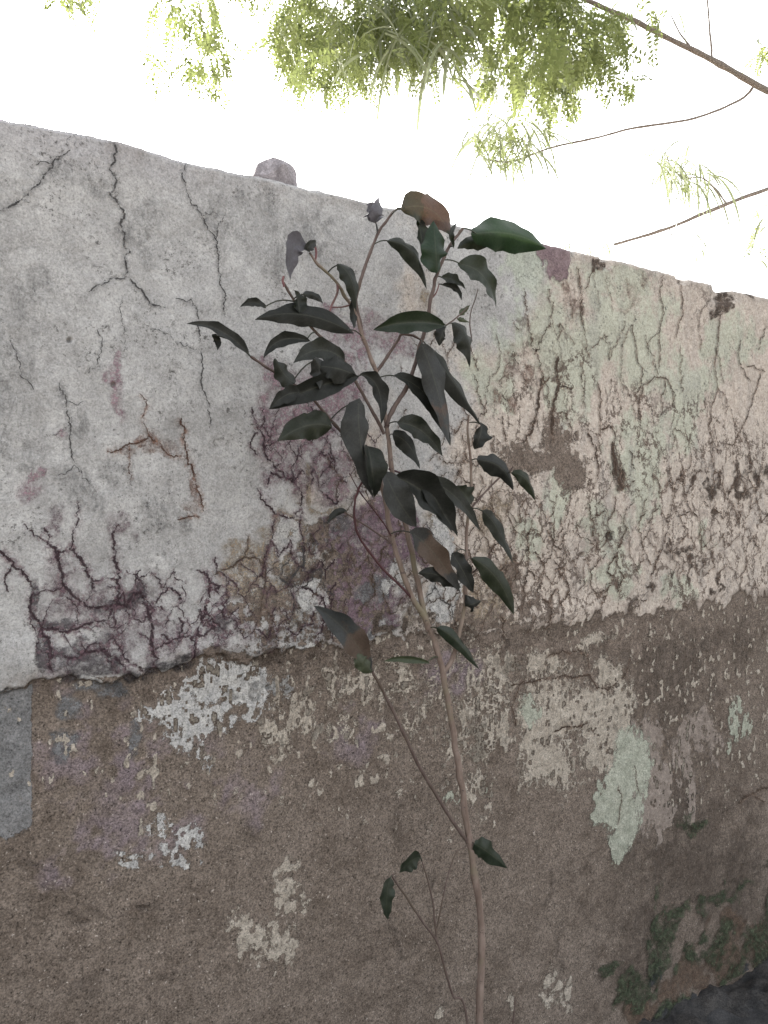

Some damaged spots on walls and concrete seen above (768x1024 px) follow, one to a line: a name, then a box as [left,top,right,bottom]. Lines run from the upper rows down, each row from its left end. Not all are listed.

crack [0,150,70,211]
crack [181,164,227,317]
crack [89,141,212,520]
crack [0,267,768,726]
peeling [131,514,753,867]
peeling [114,812,204,870]
peeling [225,854,312,977]
peeling [538,966,573,1015]